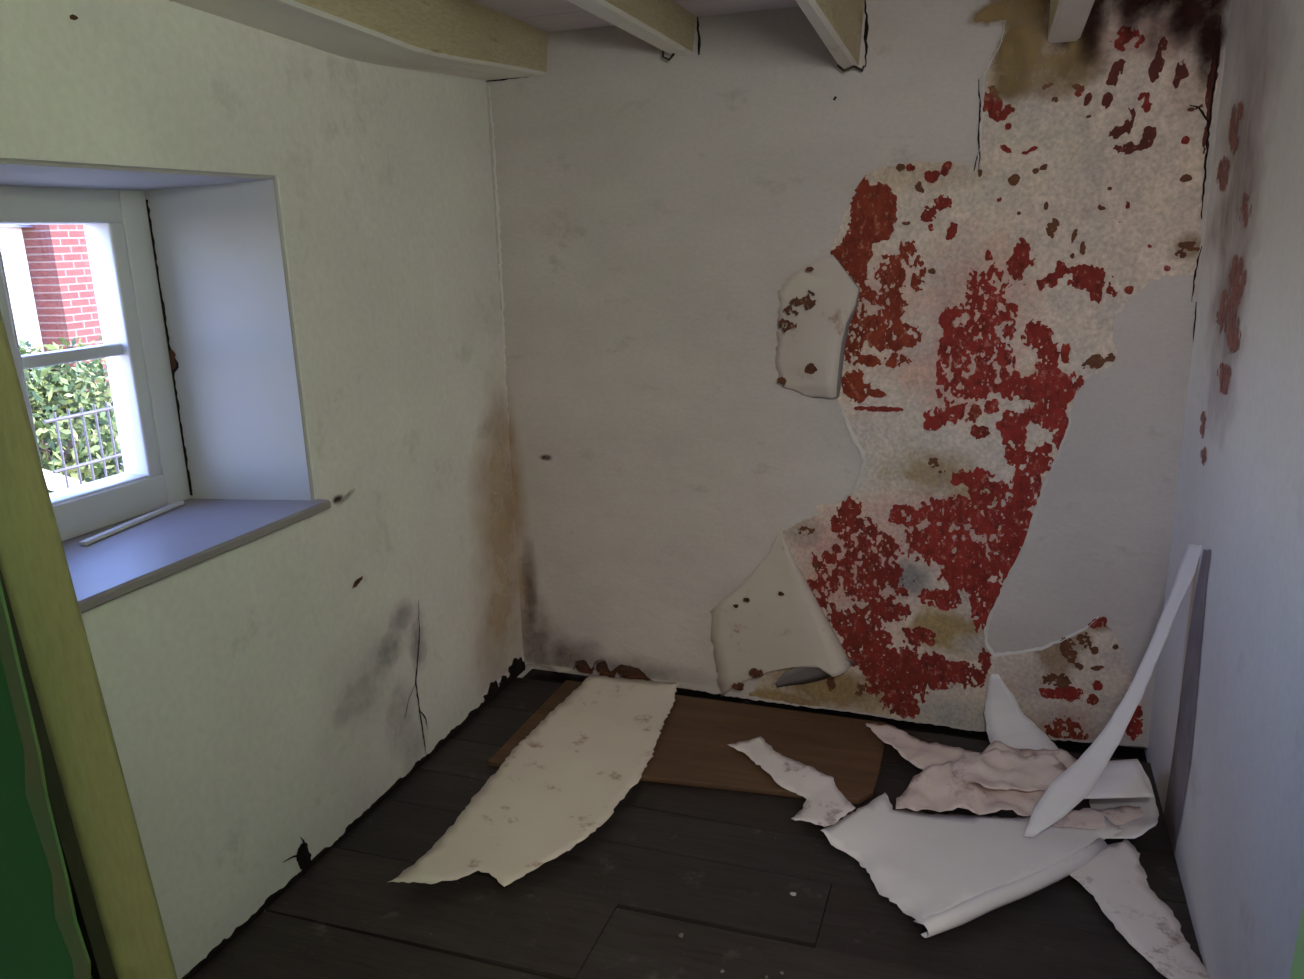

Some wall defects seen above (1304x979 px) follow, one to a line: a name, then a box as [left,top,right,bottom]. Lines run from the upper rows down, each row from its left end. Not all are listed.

water stain [973,0,1228,95]
peeling [749,0,1221,741]
peeling [1164,549,1211,852]